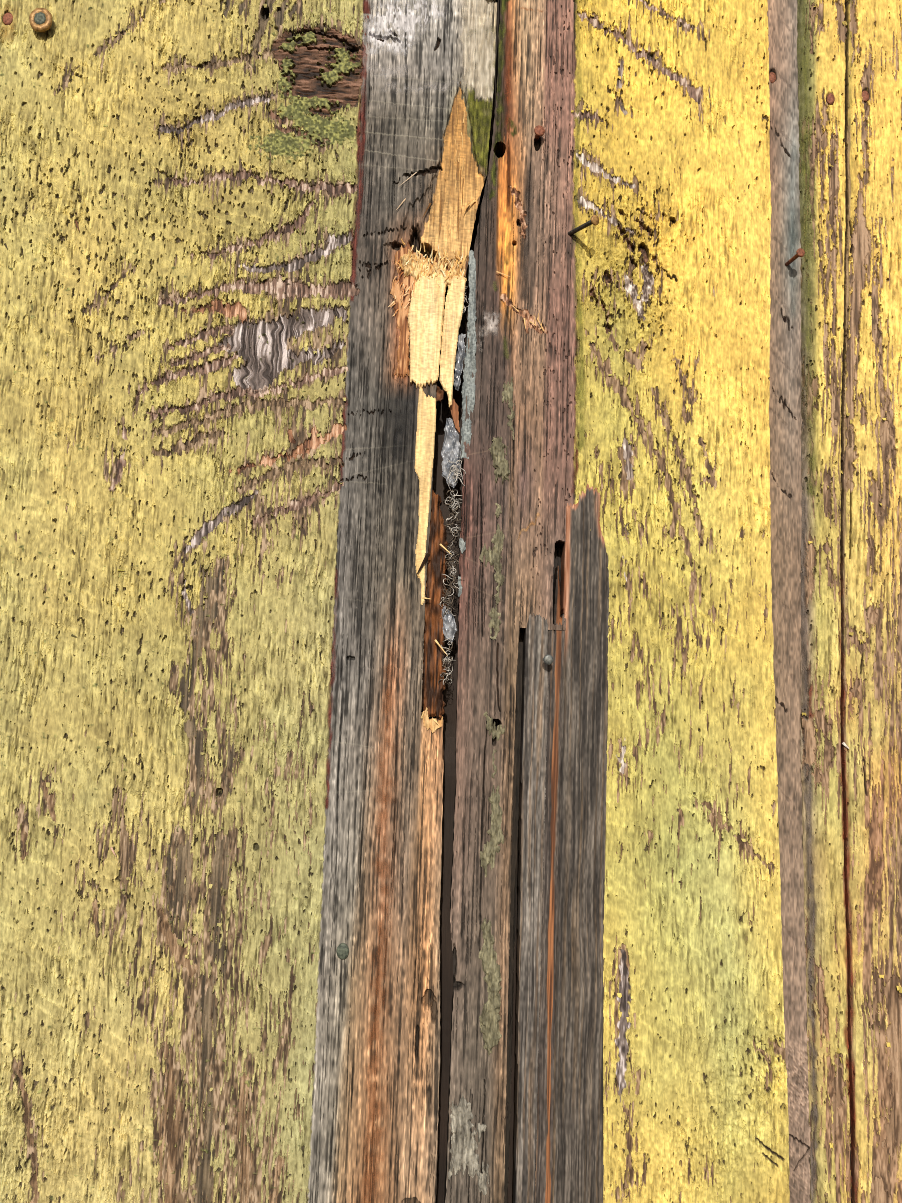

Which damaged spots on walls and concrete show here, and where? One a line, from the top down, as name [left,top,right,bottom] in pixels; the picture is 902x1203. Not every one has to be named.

peeling [163,0,297,73]
peeling [578,13,701,104]
peeling [158,96,324,146]
peeling [576,152,635,188]
peeling [171,170,357,260]
peeling [577,197,651,252]
peeling [102,265,132,298]
peeling [133,233,360,456]
peeling [590,264,653,321]
peeling [810,105,897,516]
peeling [806,541,833,596]
peeling [158,835,230,1203]